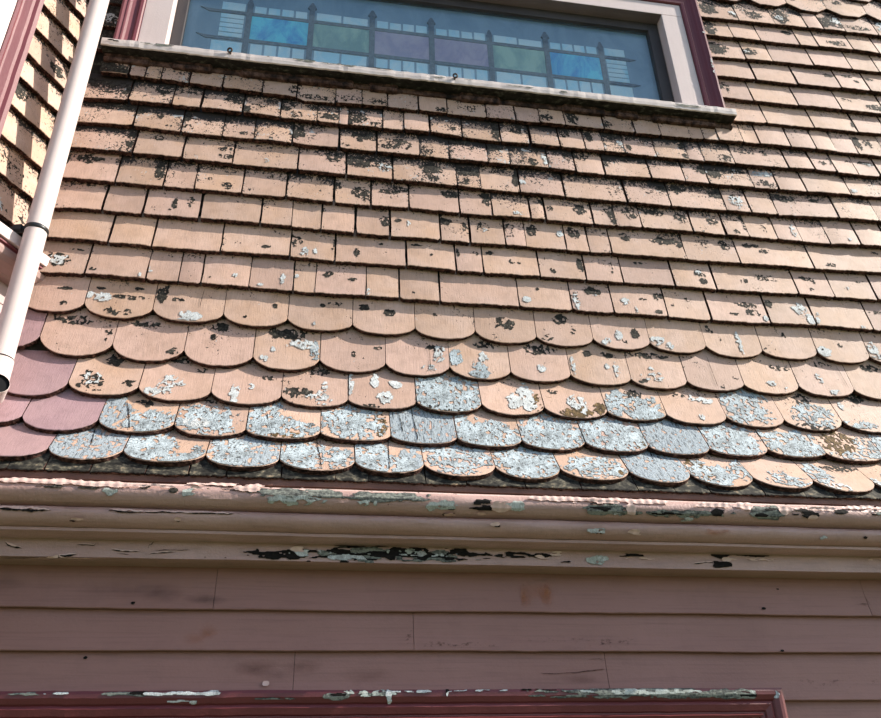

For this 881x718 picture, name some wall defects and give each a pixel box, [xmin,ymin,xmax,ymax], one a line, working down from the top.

peeling [558,113,646,166]
peeling [66,154,105,164]
peeling [511,149,548,187]
peeling [335,182,408,202]
peeling [602,188,687,241]
peeling [666,142,795,254]
peeling [49,321,881,491]
peeling [0,477,457,516]
peeling [469,496,881,527]
peeling [243,545,571,563]
peeling [323,689,432,704]
peeling [521,688,757,700]